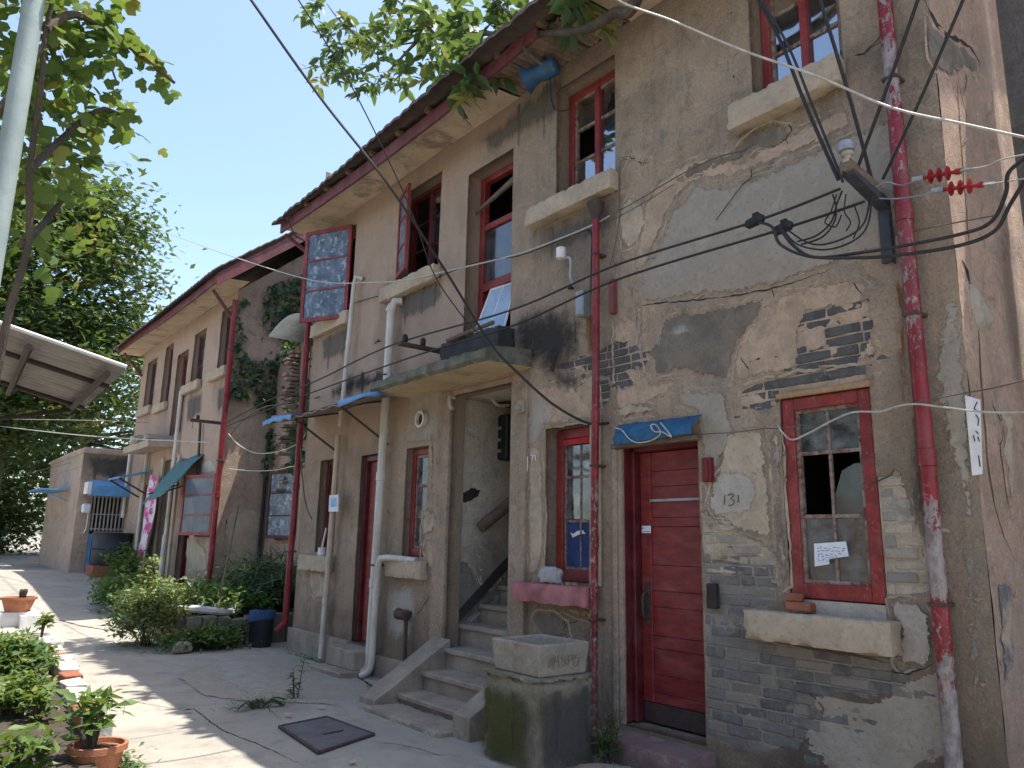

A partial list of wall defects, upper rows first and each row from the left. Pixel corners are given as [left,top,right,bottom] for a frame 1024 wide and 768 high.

crack [925,1,981,293]
flaking render [531,106,943,768]
peeling [935,301,977,516]
peeling [991,402,1016,521]
peeling [995,575,1016,697]